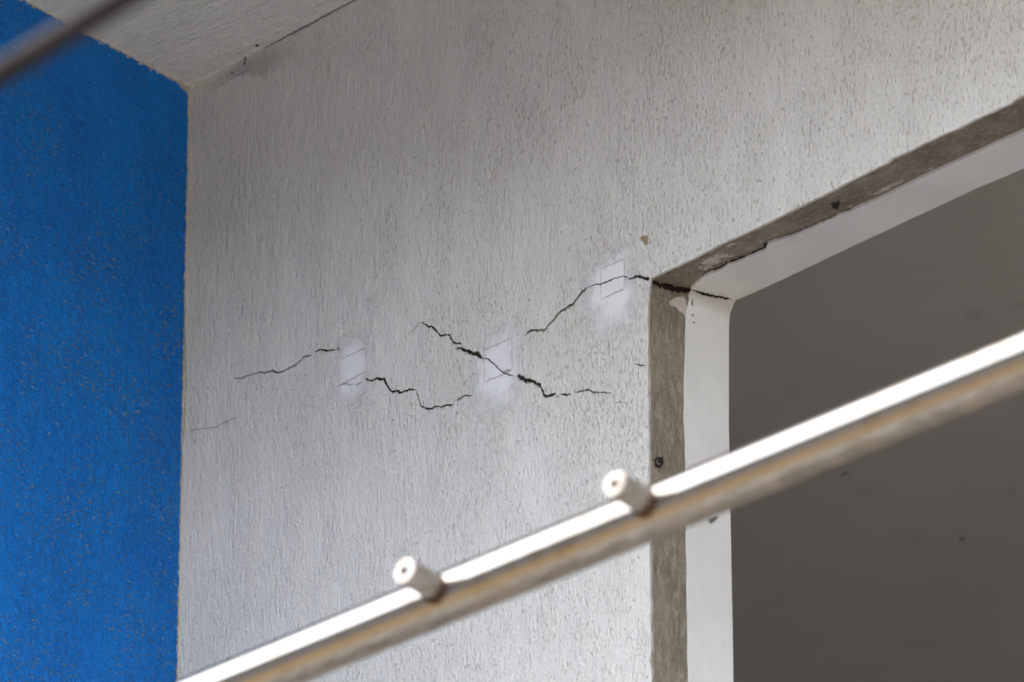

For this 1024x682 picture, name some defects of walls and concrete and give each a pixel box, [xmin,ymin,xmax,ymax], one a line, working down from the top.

crack [237,348,341,379]
crack [411,322,625,403]
crack [338,377,472,410]